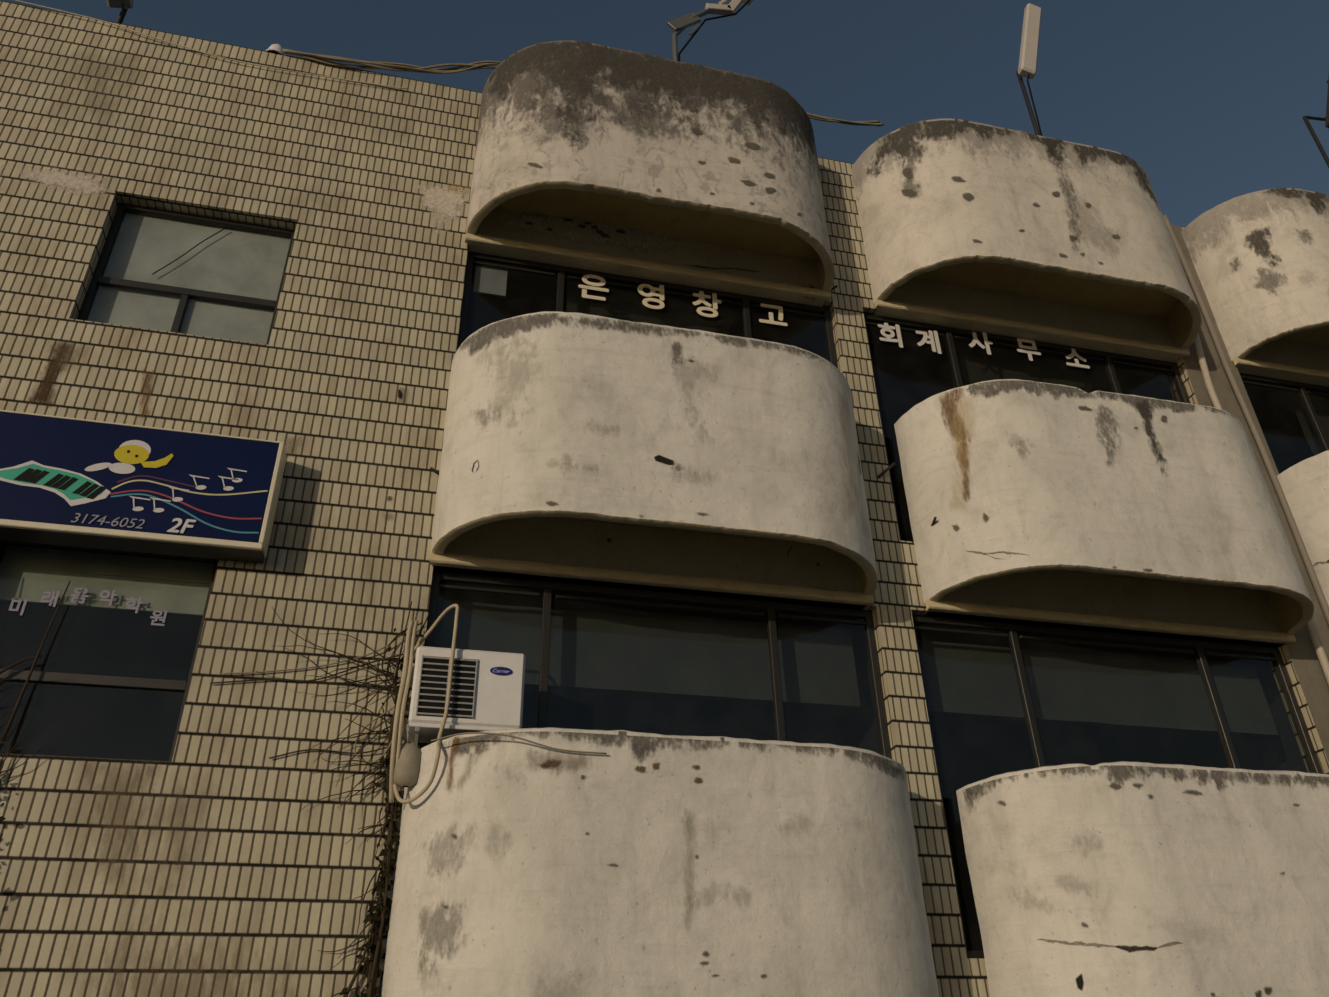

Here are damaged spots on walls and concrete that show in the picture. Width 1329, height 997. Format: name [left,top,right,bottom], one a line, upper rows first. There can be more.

mould [489,40,814,155]
water stain [867,119,1157,247]
mould [1266,188,1326,213]
mould [1246,228,1281,292]
corrosion [940,389,970,499]
water stain [968,380,1232,471]
crack [1037,939,1181,952]